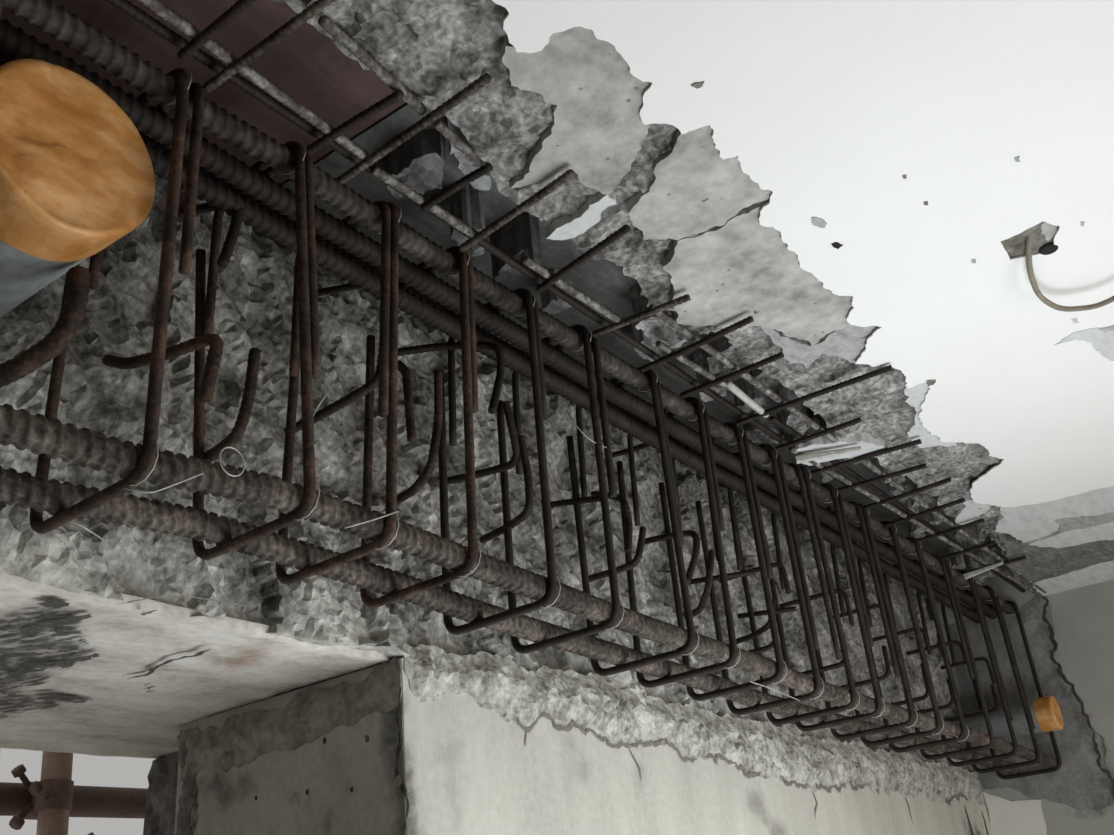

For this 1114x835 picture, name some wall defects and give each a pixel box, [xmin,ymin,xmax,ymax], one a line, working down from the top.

spalling [0,0,178,156]
spalling [105,0,1114,600]
spalling [0,137,985,835]
spalling [963,727,990,748]
spalling [955,586,1002,709]
spalling [949,736,1013,762]
spalling [974,567,1114,811]